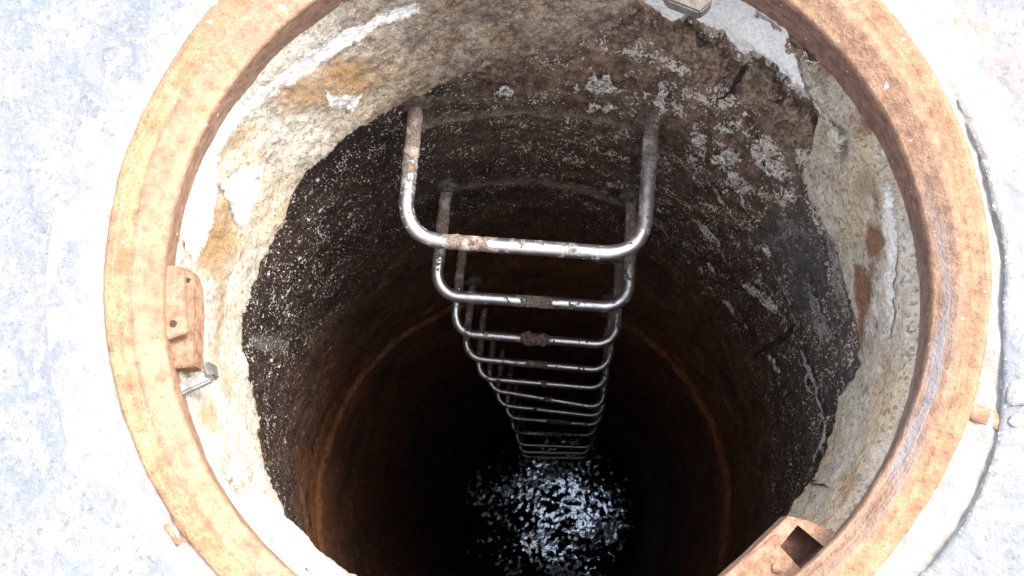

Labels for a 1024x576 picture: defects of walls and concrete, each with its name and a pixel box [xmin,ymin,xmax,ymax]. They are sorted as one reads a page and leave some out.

efflorescence [573,73,621,114]
efflorescence [653,81,668,124]
efflorescence [691,133,707,147]
spalling [608,13,815,149]
efflorescence [710,149,791,182]
corrosion [854,225,883,348]
corrosion [309,370,375,551]
crack [753,324,828,488]